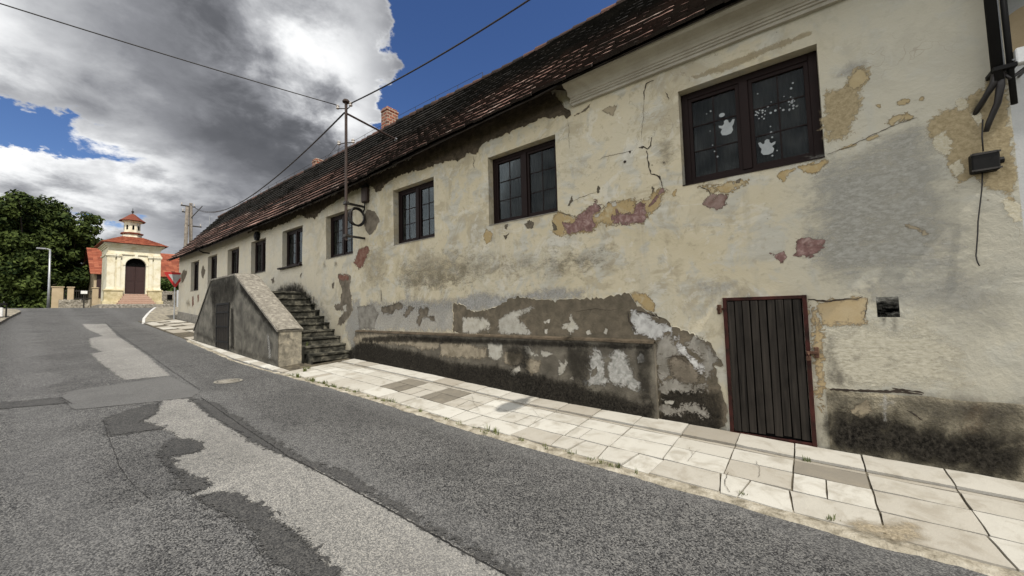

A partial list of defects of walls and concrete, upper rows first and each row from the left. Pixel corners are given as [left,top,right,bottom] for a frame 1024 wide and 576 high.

flaking render [247,92,617,234]
peeling [552,185,677,237]
crack [602,80,669,188]
peeling [697,179,750,210]
peeling [769,237,825,263]
peeling [777,65,1023,222]
flaking render [332,209,728,429]
leakage [346,289,721,429]
flaking render [808,295,868,413]
flaking render [847,400,872,418]
leakage [823,400,1024,478]